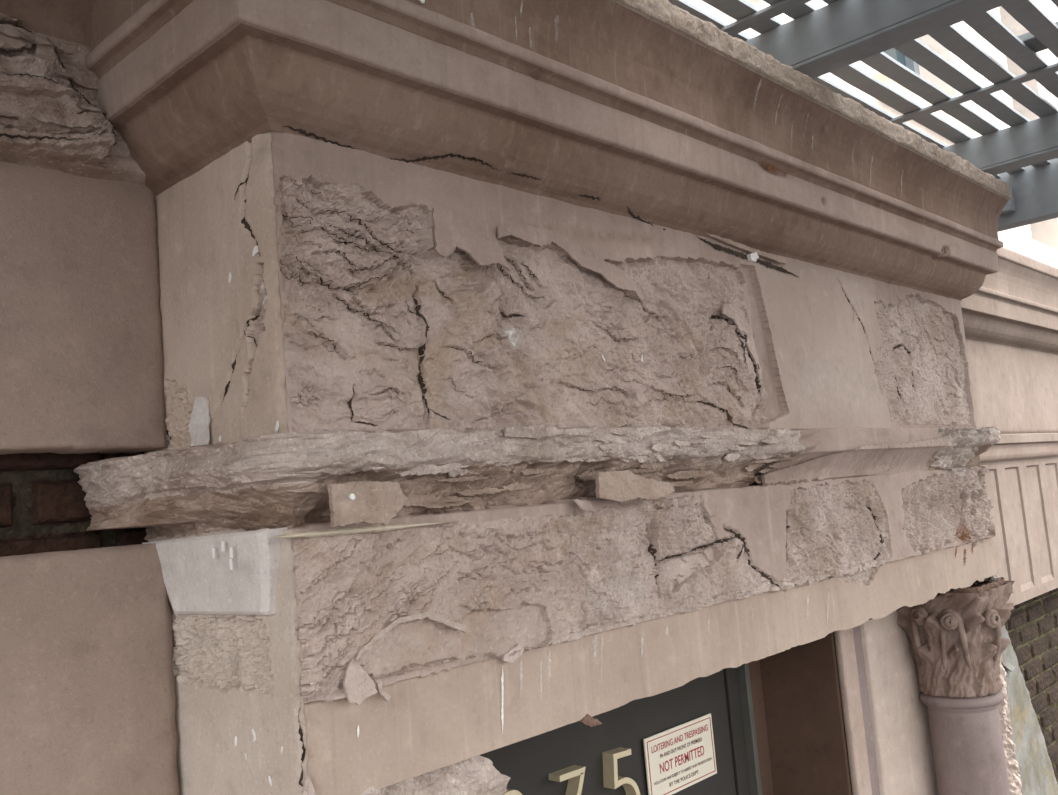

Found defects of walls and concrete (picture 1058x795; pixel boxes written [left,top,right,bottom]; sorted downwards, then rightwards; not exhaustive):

spalling [0,13,146,186]
crack [235,174,260,255]
crack [698,237,799,277]
spalling [165,378,210,450]
crack [220,310,262,405]
crack [407,296,451,422]
spalling [274,175,995,705]
crack [698,315,761,429]
crack [647,528,782,590]
spalling [172,614,274,693]
flaking render [998,625,1058,795]
spalling [363,755,511,795]